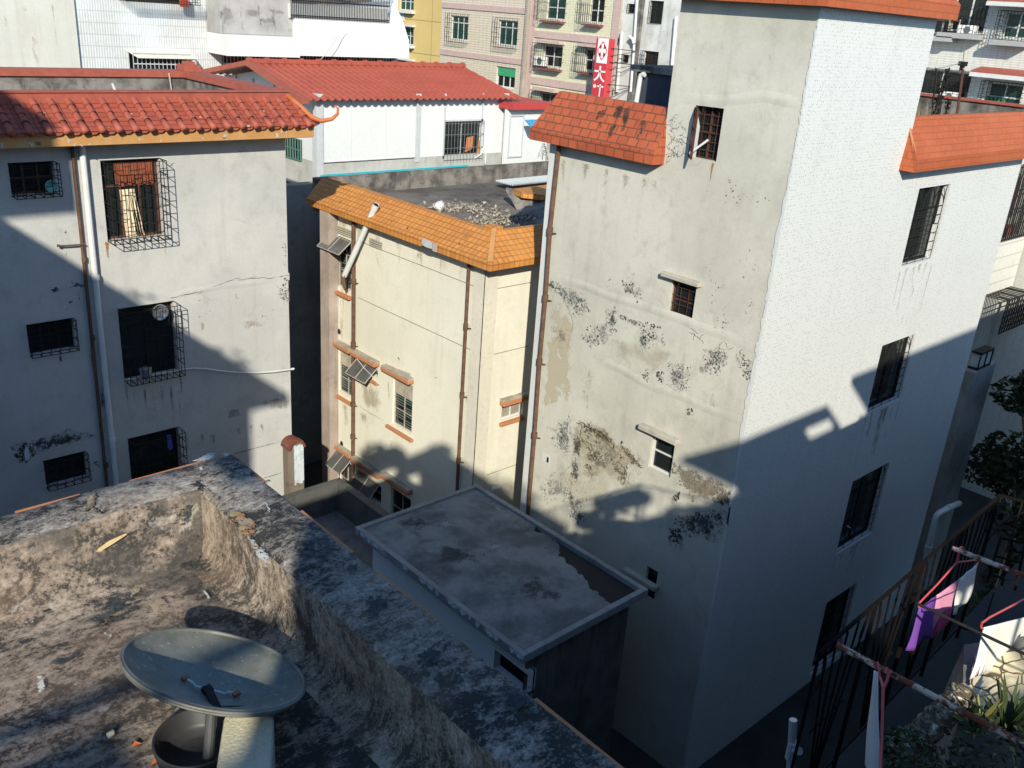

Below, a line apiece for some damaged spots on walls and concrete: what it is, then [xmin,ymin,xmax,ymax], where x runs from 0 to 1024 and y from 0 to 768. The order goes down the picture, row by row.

damp [596,106,630,136]
mould [549,280,589,315]
mould [618,315,663,348]
mould [11,429,95,463]
mould [554,416,572,453]
spalling [228,512,261,537]
mould [668,510,729,547]